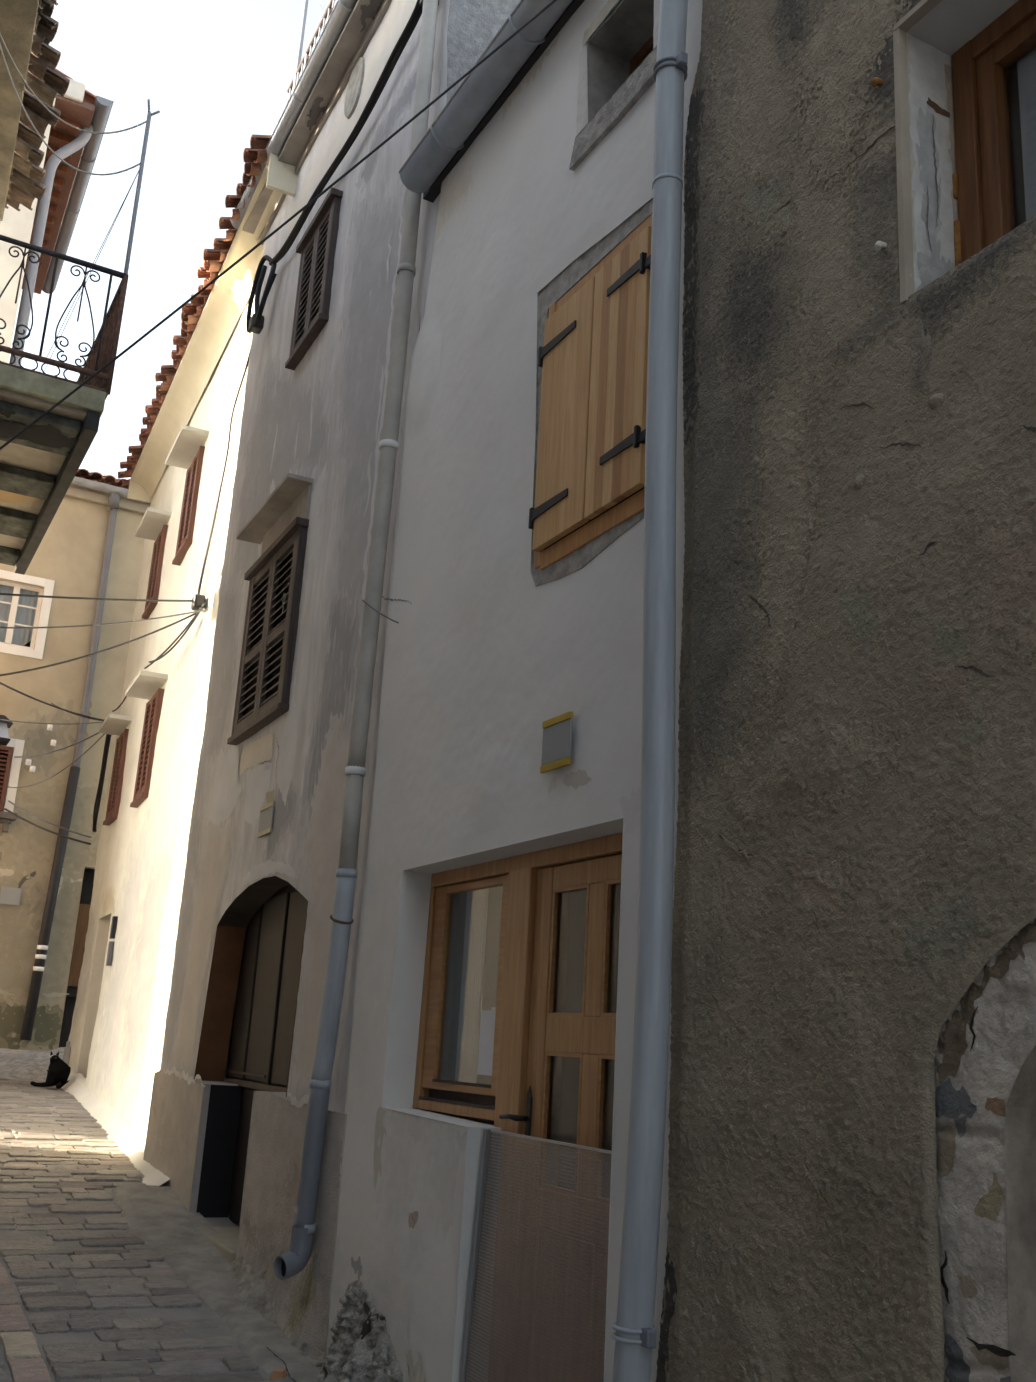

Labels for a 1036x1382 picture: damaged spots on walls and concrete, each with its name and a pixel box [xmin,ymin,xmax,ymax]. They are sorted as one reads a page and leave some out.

water stain [677,0,1036,811]
spalling [975,1173,1004,1221]
spalling [969,1346,1009,1370]